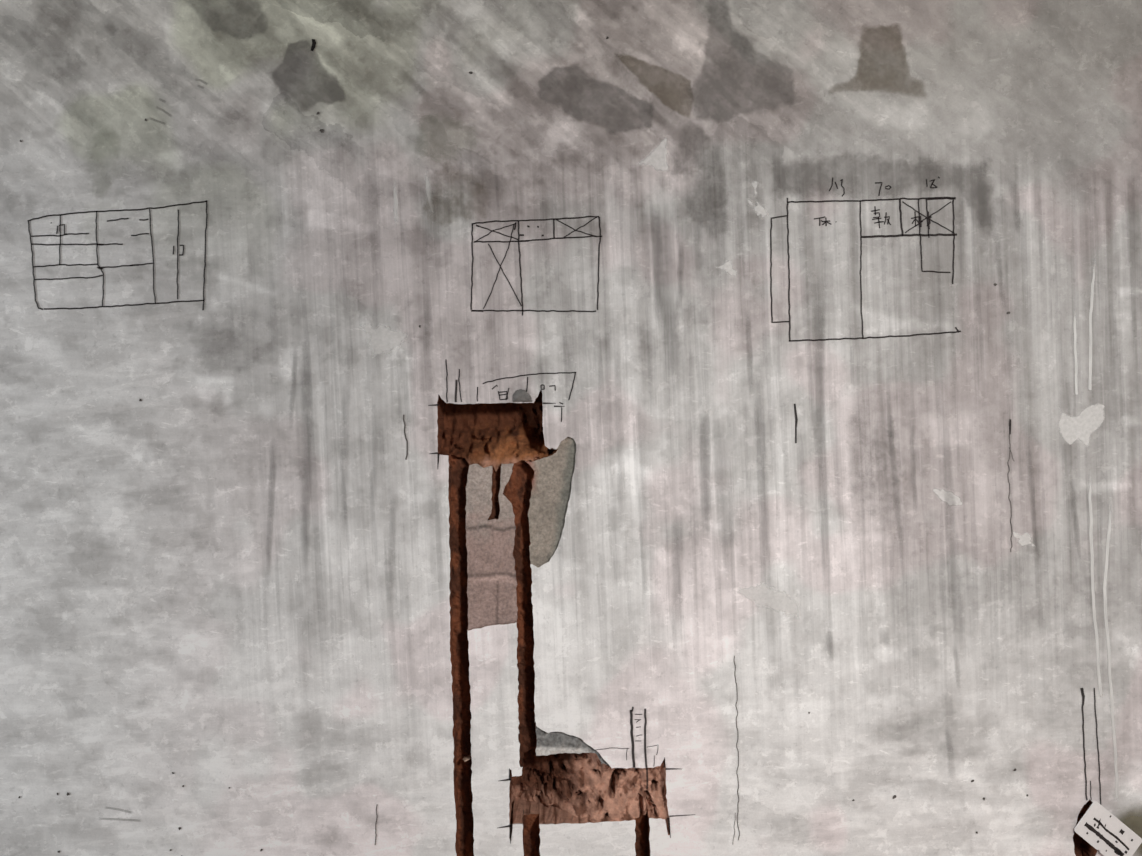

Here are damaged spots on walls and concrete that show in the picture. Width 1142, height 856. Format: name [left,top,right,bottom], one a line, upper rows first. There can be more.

leakage [1073,269,1095,395]
spalling [437,390,576,631]
leakage [1089,488,1118,799]
spalling [509,726,670,839]
leakage [1119,811,1142,855]